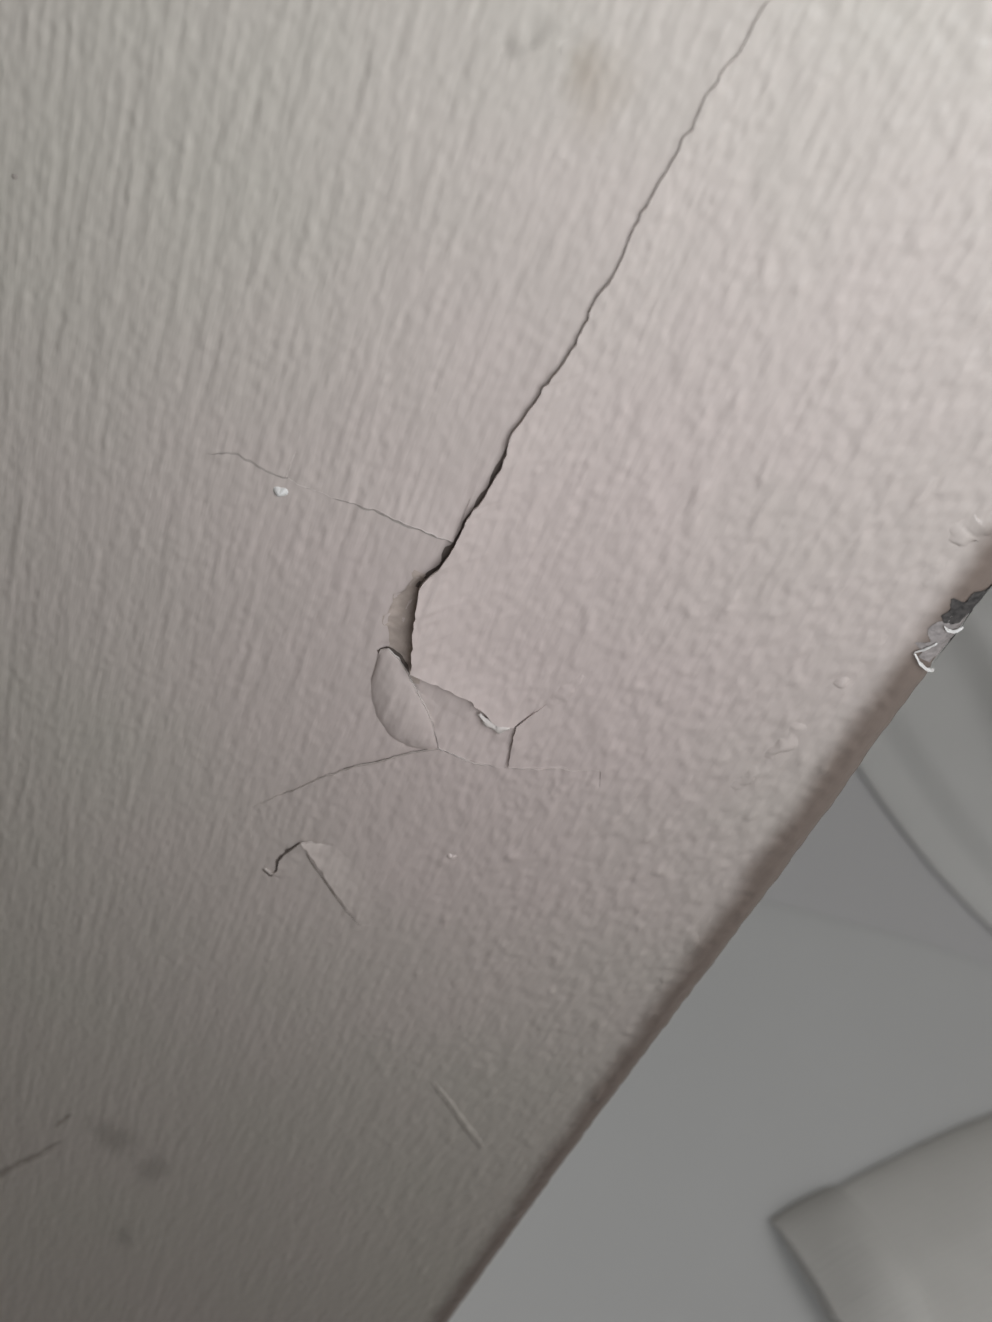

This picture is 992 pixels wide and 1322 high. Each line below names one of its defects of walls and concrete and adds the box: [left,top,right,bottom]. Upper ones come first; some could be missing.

peeling [370,0,829,769]
peeling [914,585,992,672]